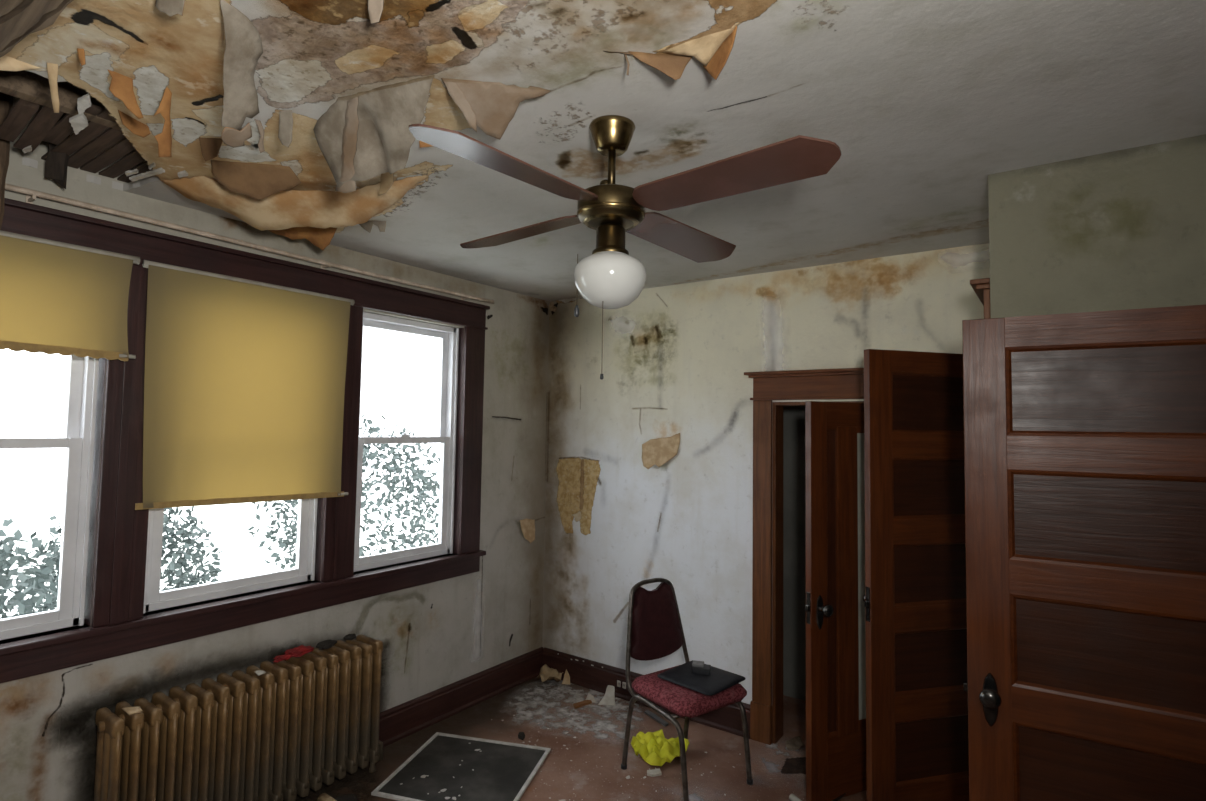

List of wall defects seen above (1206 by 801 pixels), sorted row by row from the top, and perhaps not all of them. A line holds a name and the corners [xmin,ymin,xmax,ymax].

flaking render [6,0,643,192]
flaking render [356,161,452,217]
damp [558,152,570,168]
peeling [642,433,680,469]
flaking render [556,457,601,535]
crack [42,664,92,737]